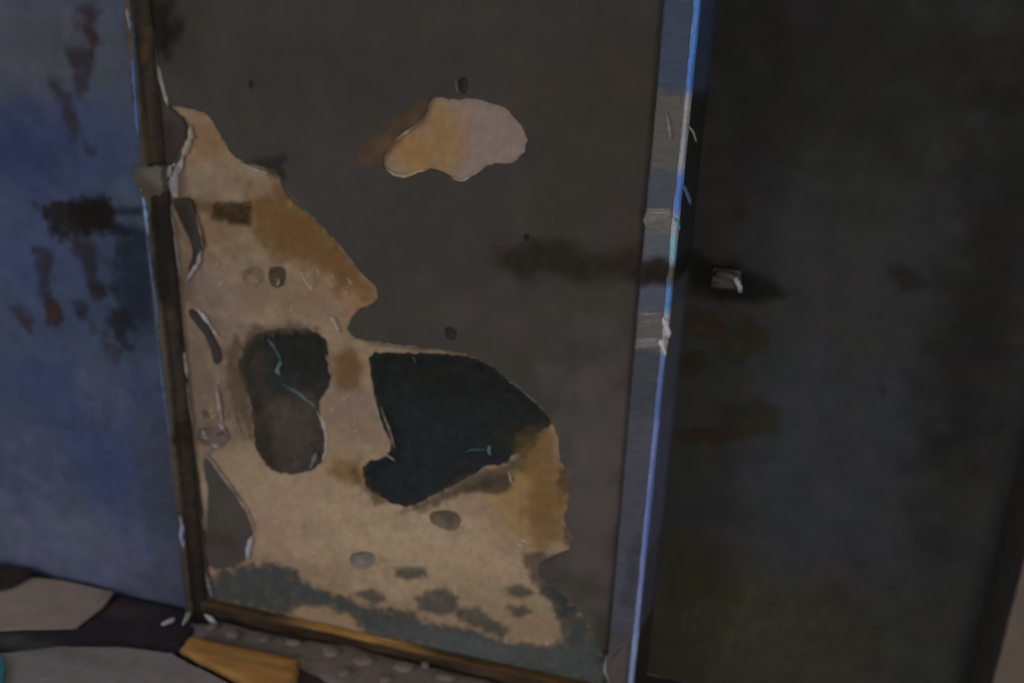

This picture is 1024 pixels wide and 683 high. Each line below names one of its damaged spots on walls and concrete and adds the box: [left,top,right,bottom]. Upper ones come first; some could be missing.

rust [42,198,172,302]
water stain [689,253,778,300]
peeling [153,33,573,650]
water stain [210,563,605,683]